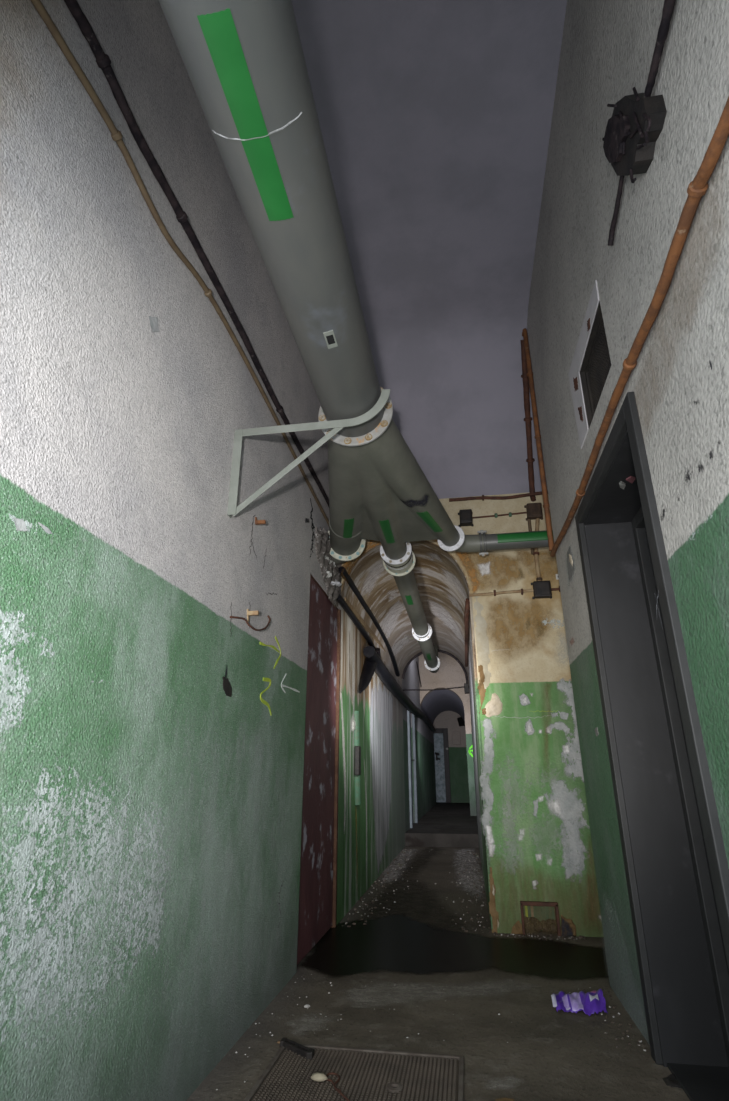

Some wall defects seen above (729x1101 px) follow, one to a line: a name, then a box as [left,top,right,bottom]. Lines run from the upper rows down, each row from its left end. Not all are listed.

damp [429,539,558,642]
damp [491,600,564,654]
peeling [525,679,590,879]